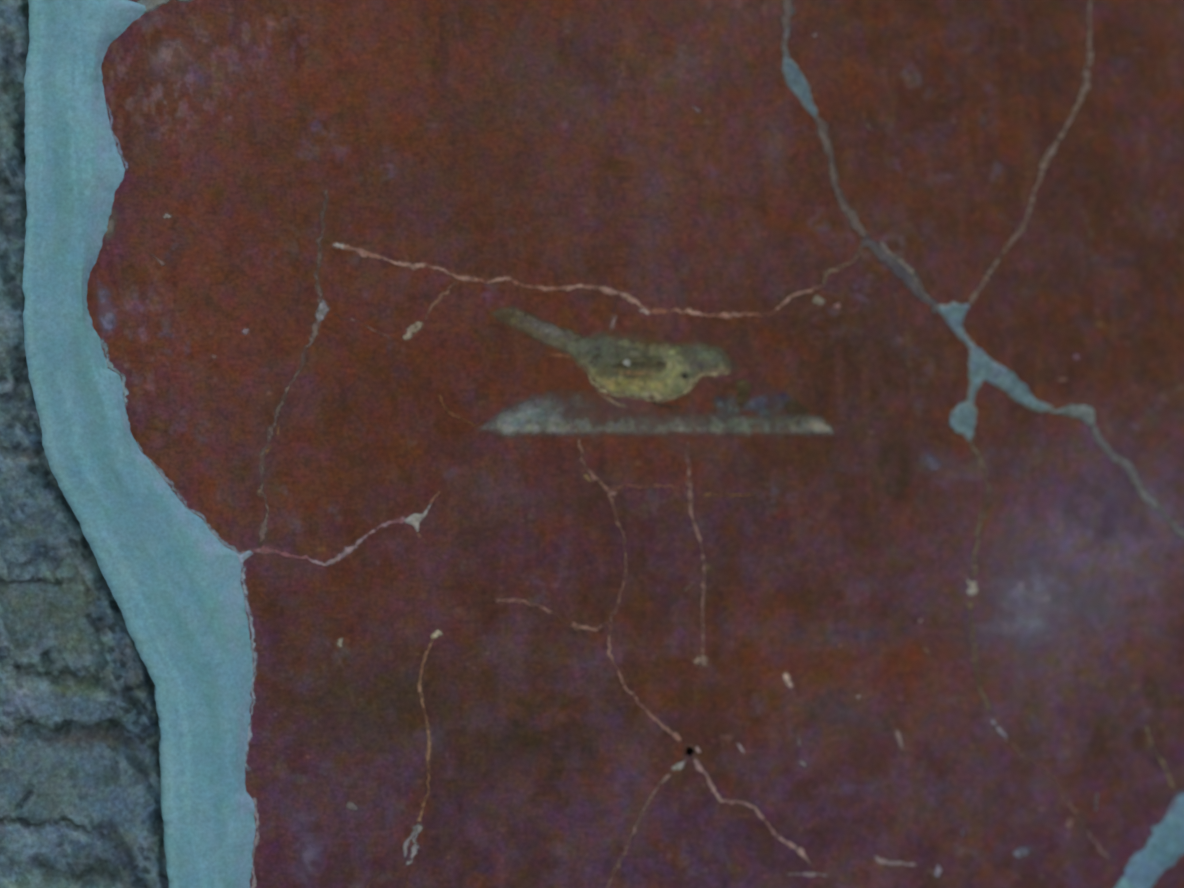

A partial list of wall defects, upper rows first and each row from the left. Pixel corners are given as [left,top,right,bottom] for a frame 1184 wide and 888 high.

crack [137,0,189,13]
crack [236,0,1184,862]
crack [606,758,827,888]
crack [875,856,917,866]